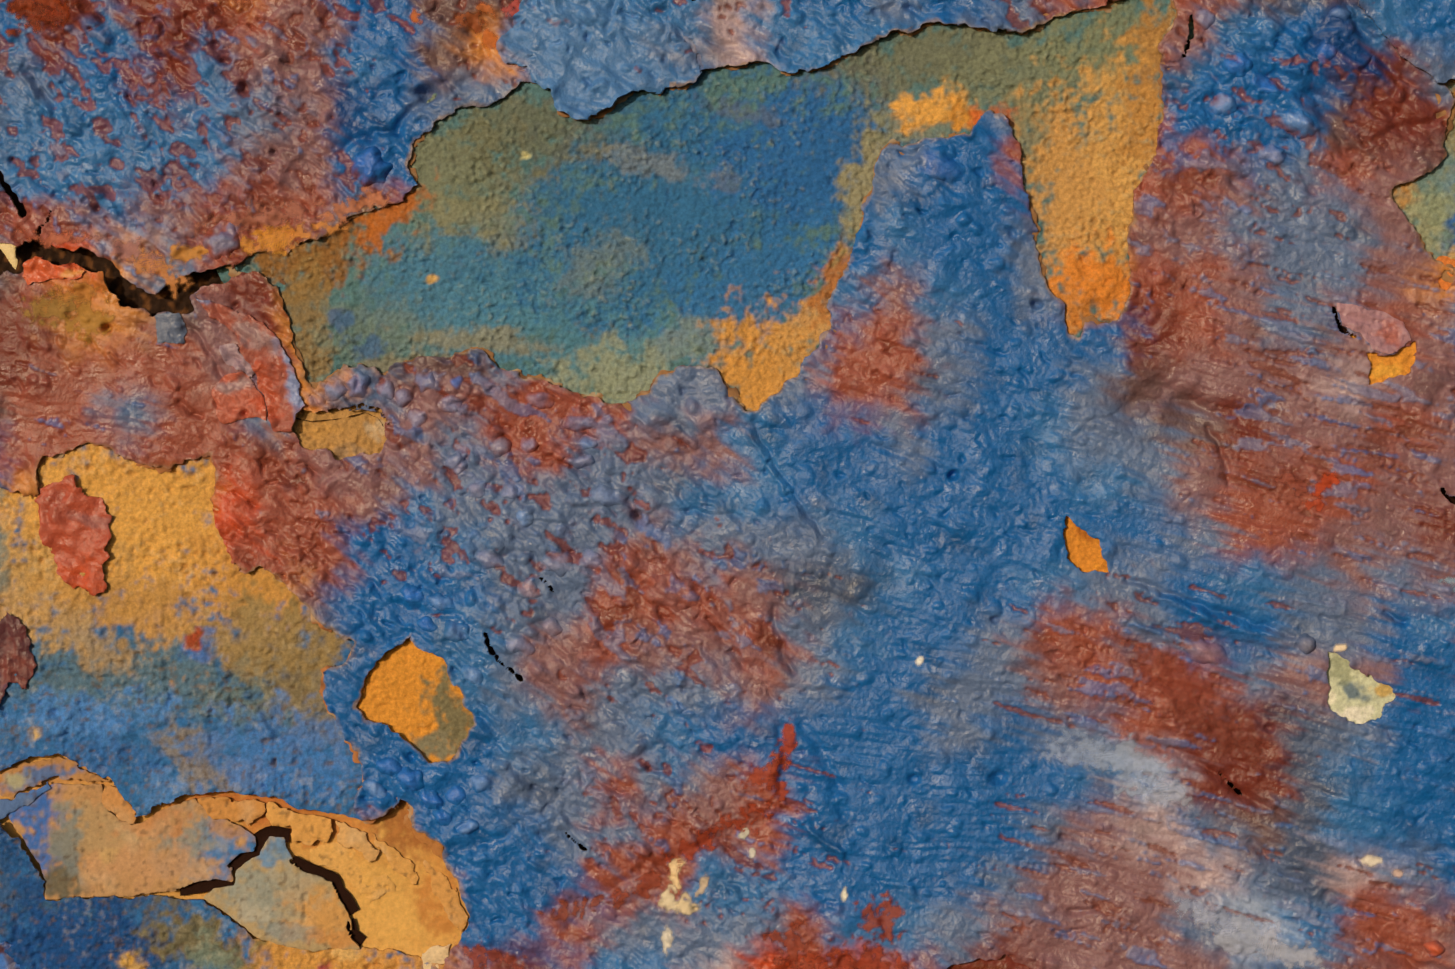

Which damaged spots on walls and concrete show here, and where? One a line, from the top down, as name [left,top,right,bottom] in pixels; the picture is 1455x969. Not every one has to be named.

crack [0,171,224,344]
flaking render [195,0,1194,460]
peeling [1358,0,1455,290]
peeling [0,443,474,969]
peeling [1063,515,1109,573]
peeling [1327,652,1395,724]